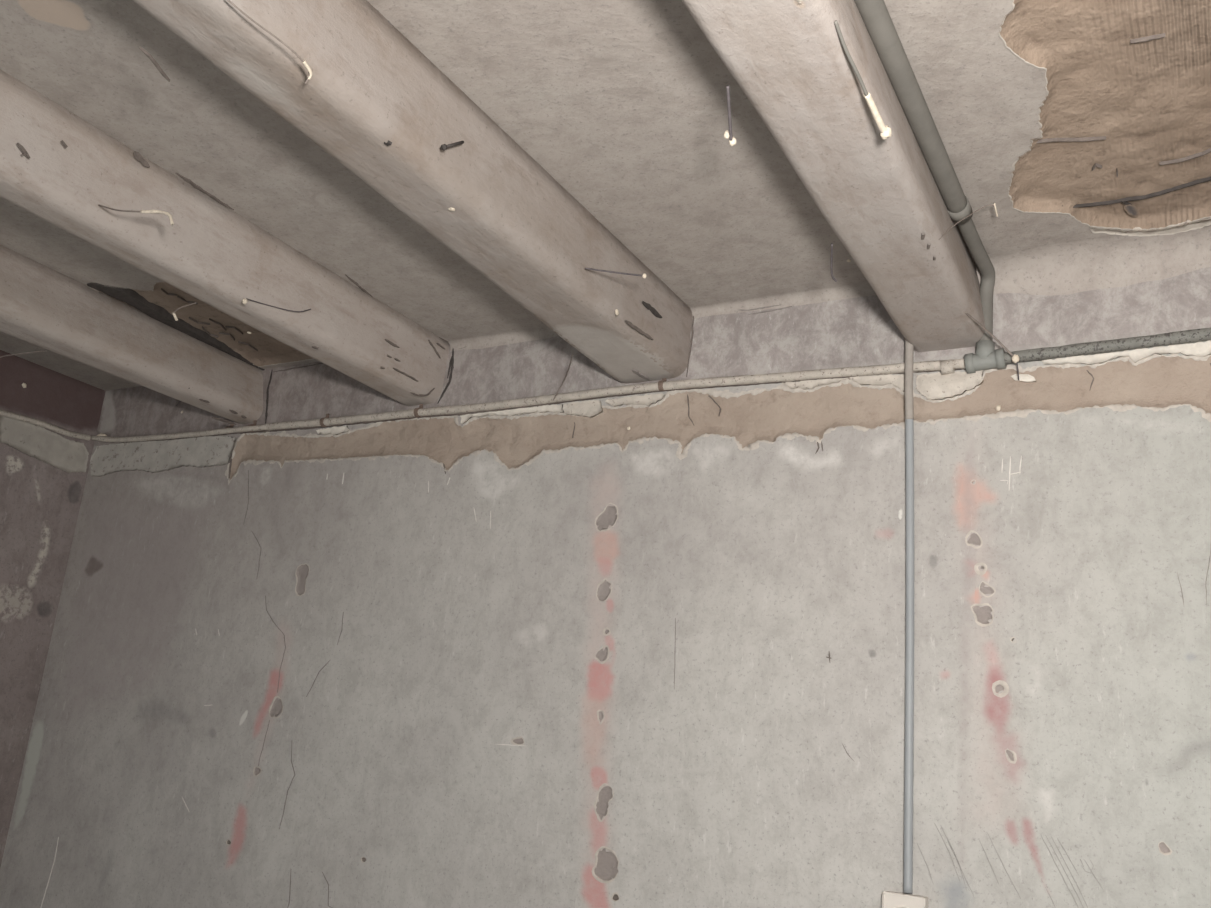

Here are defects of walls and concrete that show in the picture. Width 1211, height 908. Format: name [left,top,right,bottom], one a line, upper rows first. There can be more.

flaking render [999,0,1211,230]
crack [345,275,373,297]
flaking render [86,282,319,367]
spalling [381,339,435,396]
flaking render [199,354,1211,485]
flaking render [595,503,618,532]
crack [87,283,965,829]
flaking render [596,578,612,602]
flaking render [965,530,996,627]
flaking render [594,783,614,822]
flaking render [591,846,619,883]